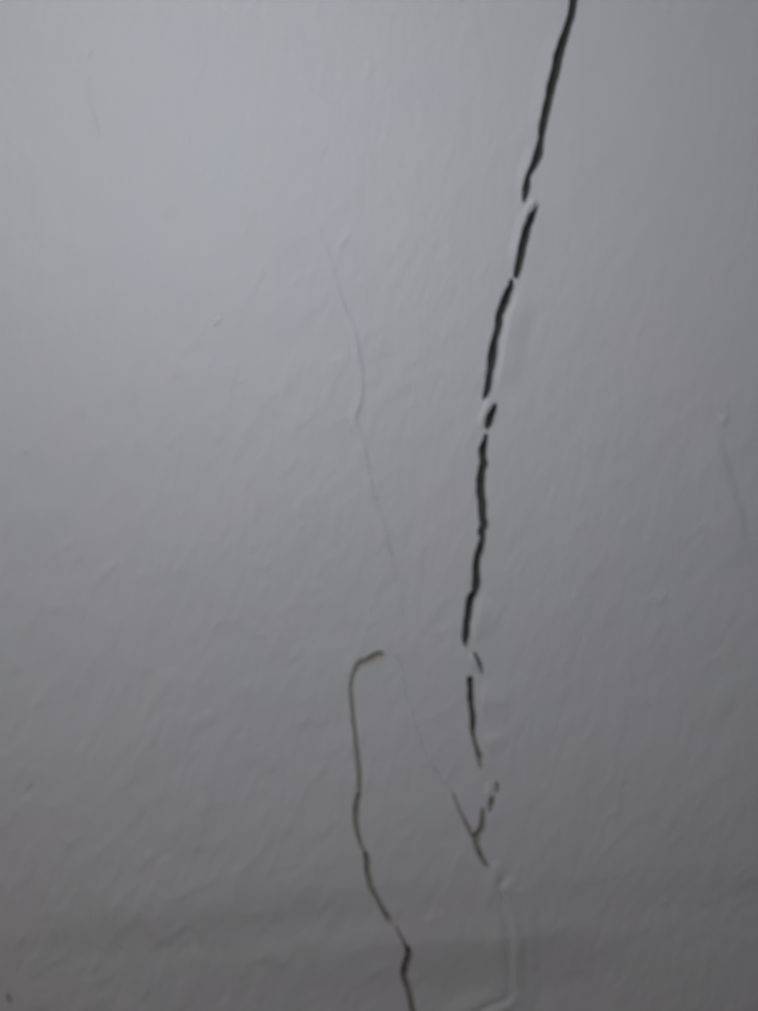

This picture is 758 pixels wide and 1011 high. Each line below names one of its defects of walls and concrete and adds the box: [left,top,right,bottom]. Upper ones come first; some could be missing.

crack [348,651,416,1011]
crack [452,0,578,868]